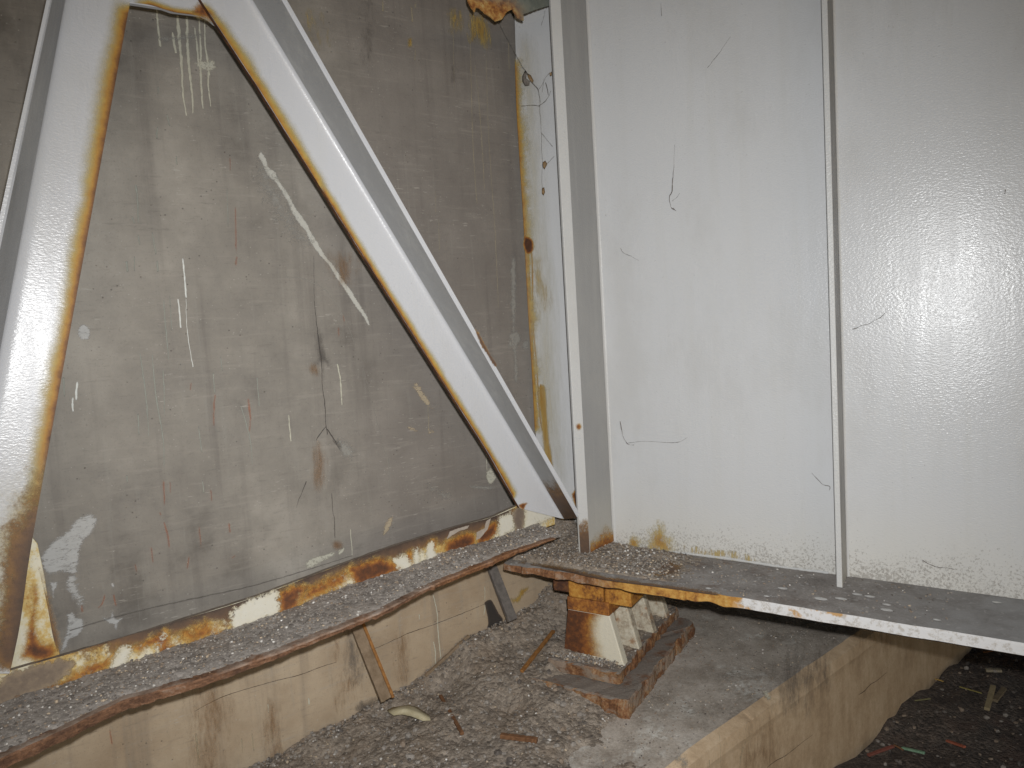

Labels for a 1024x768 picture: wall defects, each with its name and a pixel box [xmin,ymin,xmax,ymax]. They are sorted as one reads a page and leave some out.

corrosion [515,61,552,464]
corrosion [0,0,526,688]
crack [314,301,337,444]
peeling [61,612,83,651]
corrosion [564,610,597,656]
corrosion [519,526,718,595]